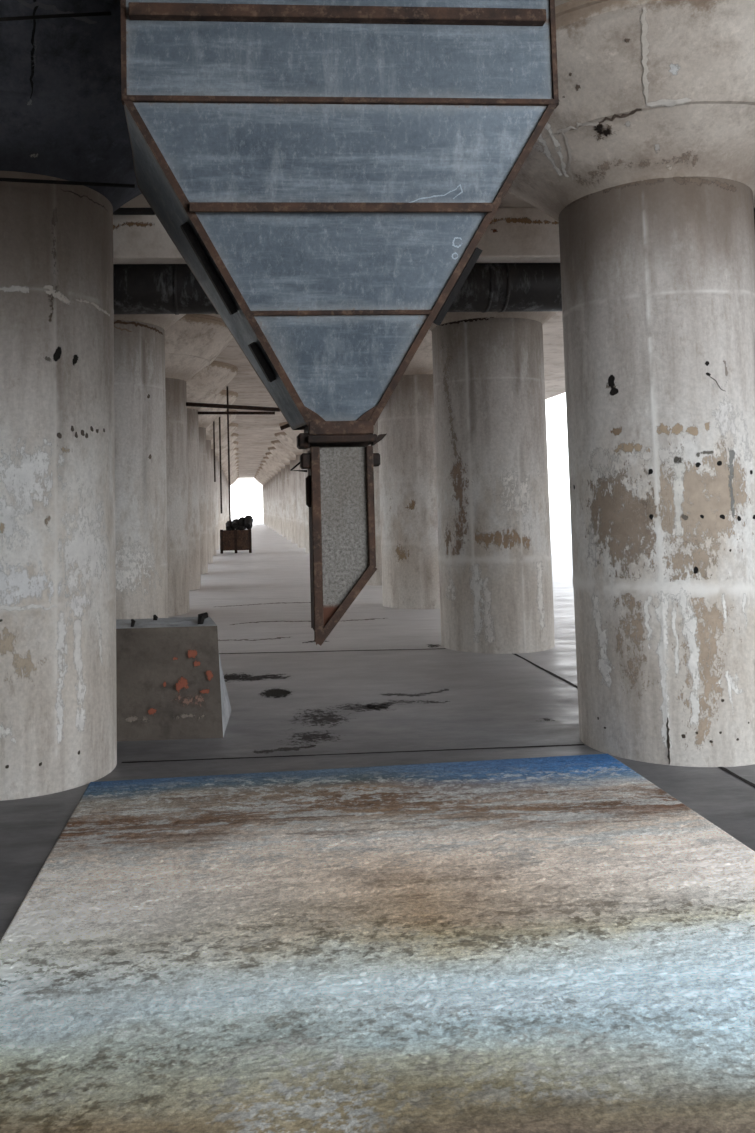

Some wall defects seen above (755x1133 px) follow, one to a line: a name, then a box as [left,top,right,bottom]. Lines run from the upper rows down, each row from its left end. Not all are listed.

crack [25,0,39,106]
crack [551,108,642,180]
peeling [580,422,754,582]
water stain [277,689,450,748]